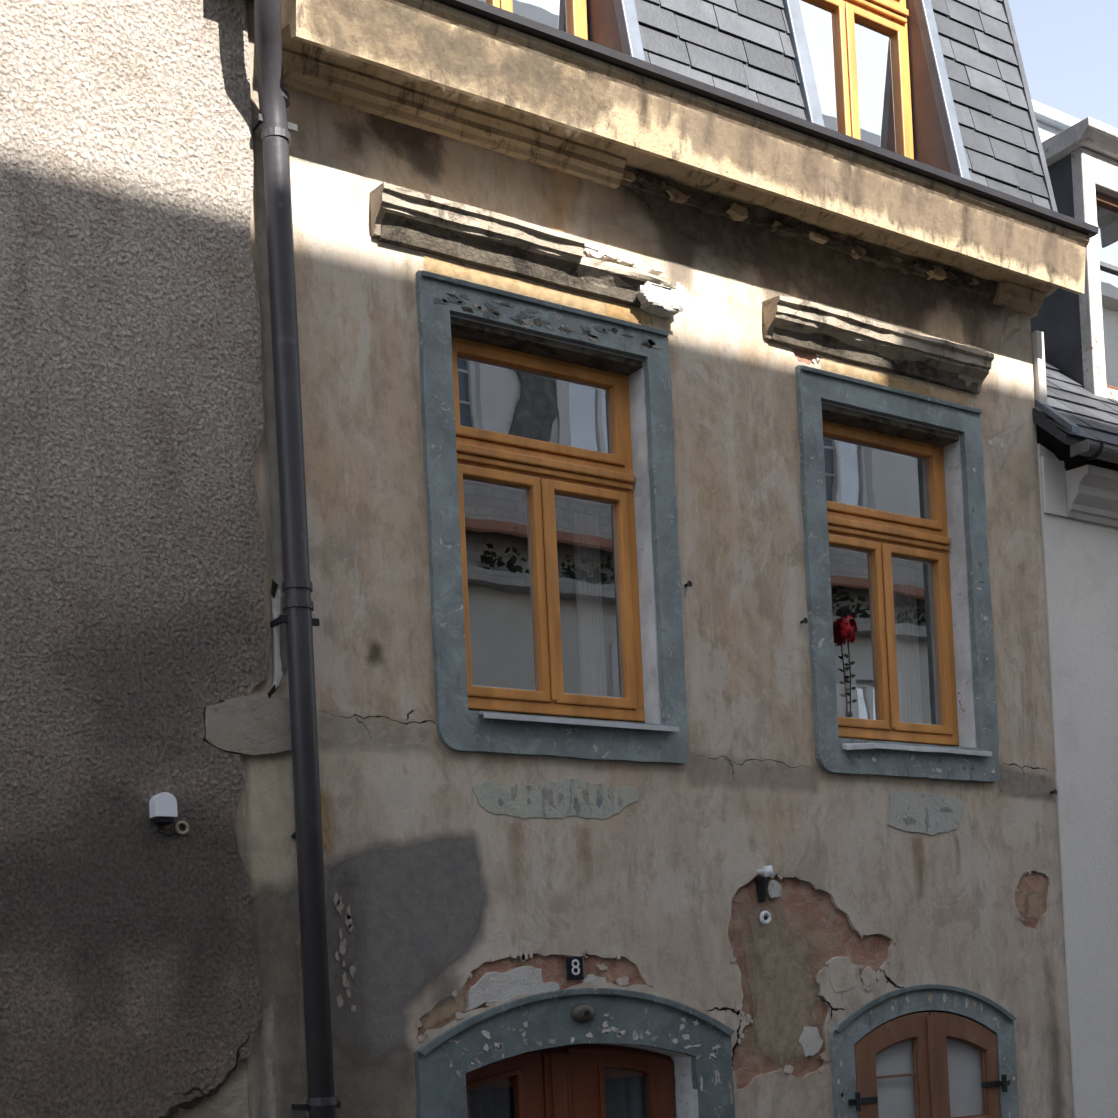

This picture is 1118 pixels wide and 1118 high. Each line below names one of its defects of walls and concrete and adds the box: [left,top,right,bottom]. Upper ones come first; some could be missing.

spalling [617,166,997,300]
peeling [425,243,686,349]
crack [323,710,436,738]
crack [694,754,809,779]
flaking render [1015,870,1052,929]
flaking render [416,949,646,1042]
flaking render [728,869,897,1118]
crack [158,1035,250,1118]
flaking render [163,1058,249,1118]
peeling [447,1030,504,1064]
peeling [571,1013,718,1063]